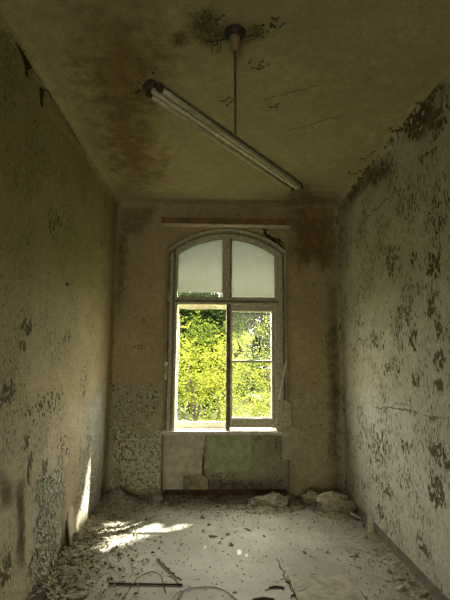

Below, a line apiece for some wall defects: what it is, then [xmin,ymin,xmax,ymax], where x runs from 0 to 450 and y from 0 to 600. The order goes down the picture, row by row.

peeling [348,101,448,195]
crack [262,228,285,249]
peeling [426,250,441,280]
peeling [357,303,418,352]
peeling [428,293,445,395]
crack [373,396,447,419]
peeling [24,435,70,578]
peeling [75,410,98,513]
peeling [110,421,208,494]
peeling [354,423,391,522]
peeling [428,442,450,512]
peeling [0,550,13,586]